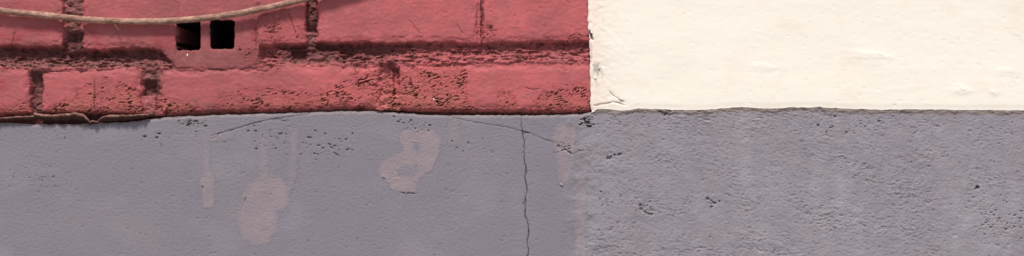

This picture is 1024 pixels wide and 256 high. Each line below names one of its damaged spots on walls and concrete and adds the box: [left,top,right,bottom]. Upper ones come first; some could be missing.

spalling [0,11,476,194]
crack [521,129,529,256]